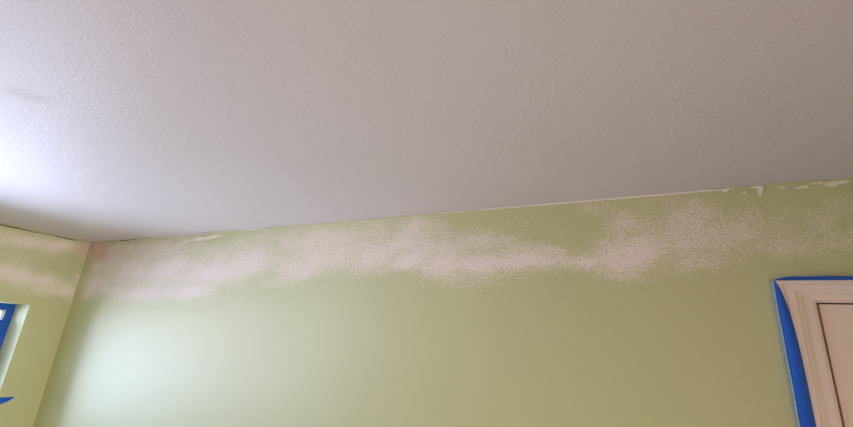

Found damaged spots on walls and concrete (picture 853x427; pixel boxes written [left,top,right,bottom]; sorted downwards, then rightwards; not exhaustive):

leakage [0,226,284,308]
leakage [334,222,678,285]